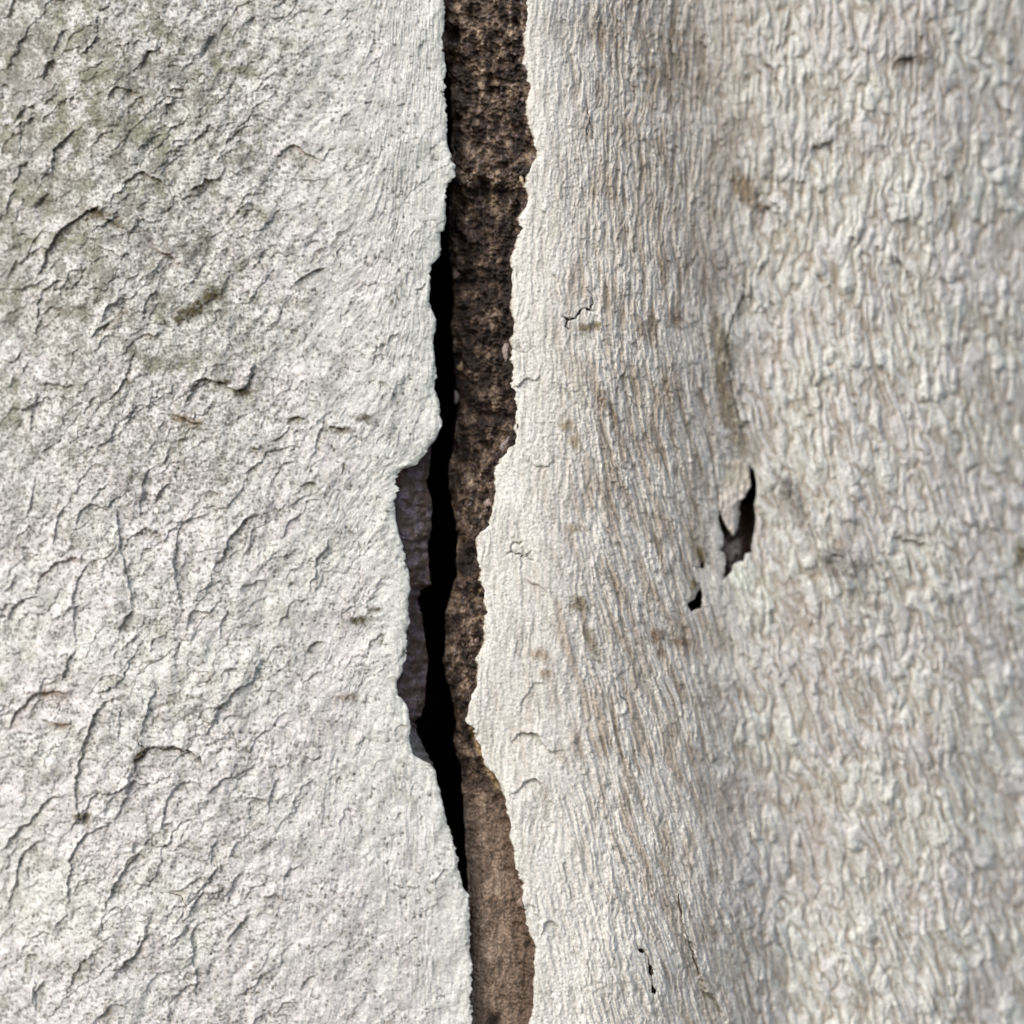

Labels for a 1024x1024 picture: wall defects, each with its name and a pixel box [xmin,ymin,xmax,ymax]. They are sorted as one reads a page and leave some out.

crack [394,0,537,1024]
peeling [719,459,750,534]